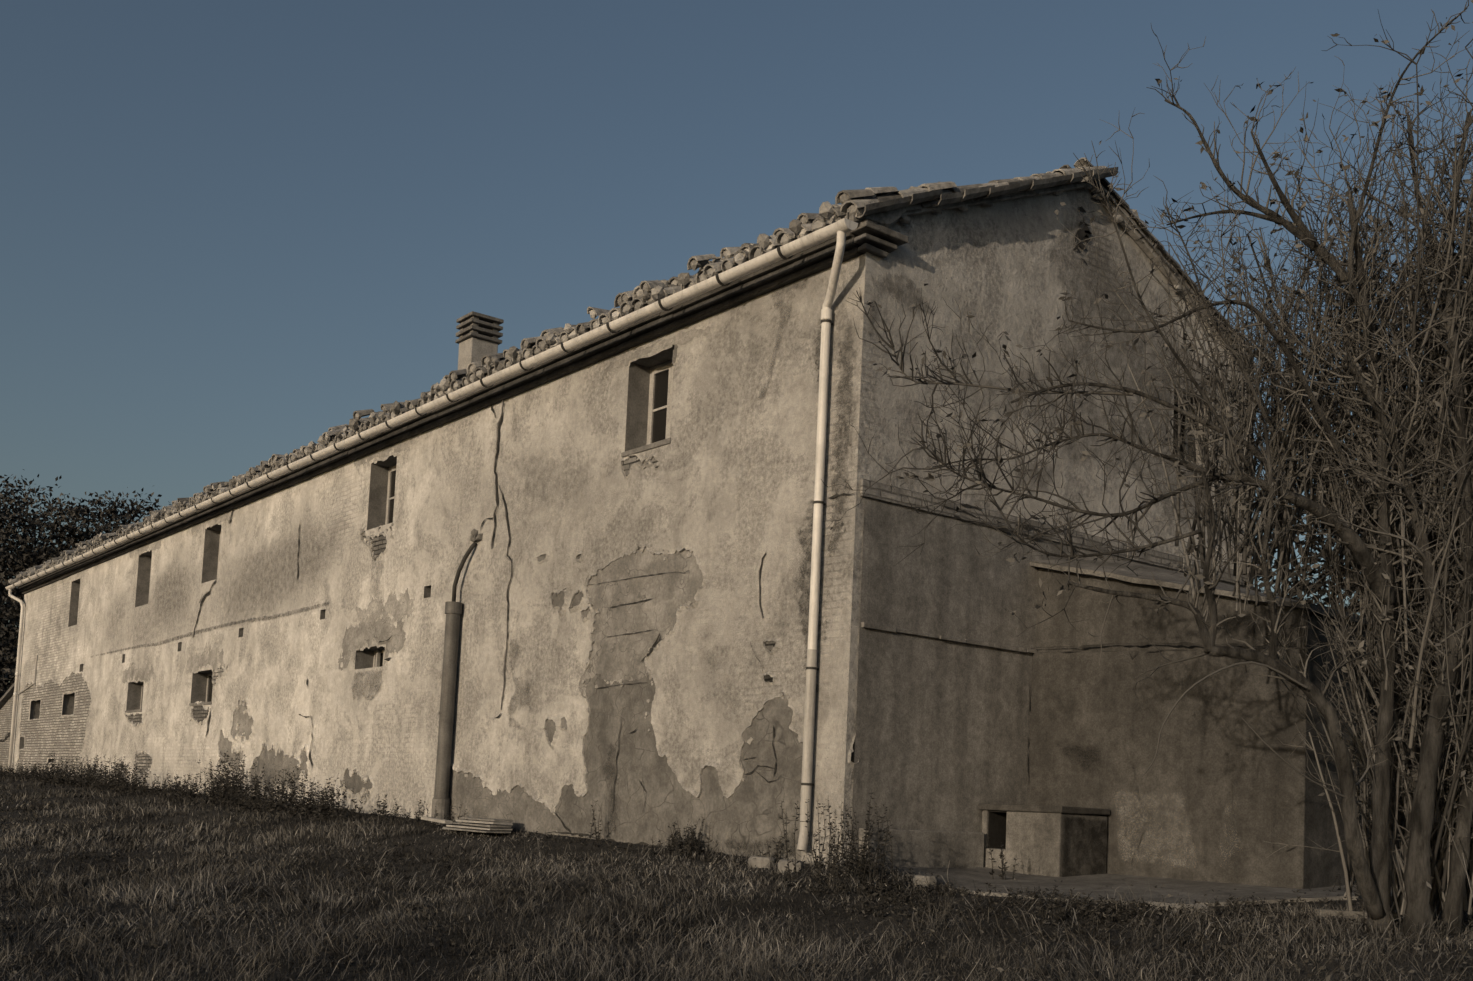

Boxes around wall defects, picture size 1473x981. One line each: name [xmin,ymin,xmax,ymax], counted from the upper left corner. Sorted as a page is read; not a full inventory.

flaking render [17,671,92,772]
crack [192,581,216,638]
flaking render [185,641,310,793]
spalling [337,586,414,673]
crack [480,400,512,718]
flaking render [448,543,810,861]